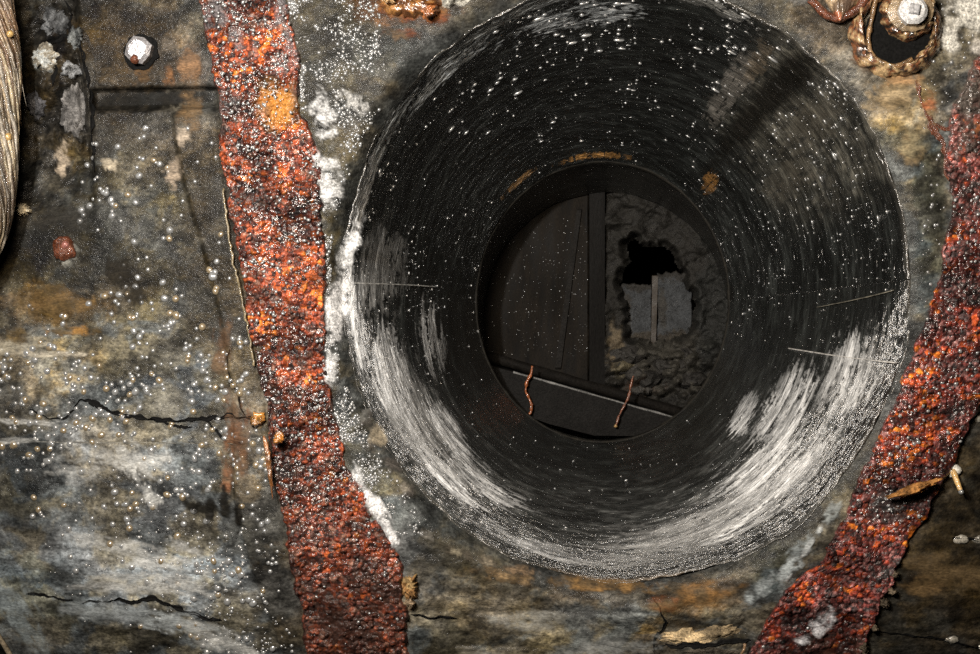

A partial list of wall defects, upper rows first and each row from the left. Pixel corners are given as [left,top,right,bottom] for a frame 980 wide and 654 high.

water stain [310,96,337,138]
water stain [314,153,342,206]
crack [29,349,251,445]
rust [167,0,410,654]
water stain [323,356,336,380]
water stain [325,115,519,512]
rust [746,52,980,654]
water stain [353,467,399,545]
crack [27,592,221,621]
crack [650,594,751,654]
spalling [659,624,742,654]
crack [879,630,977,648]